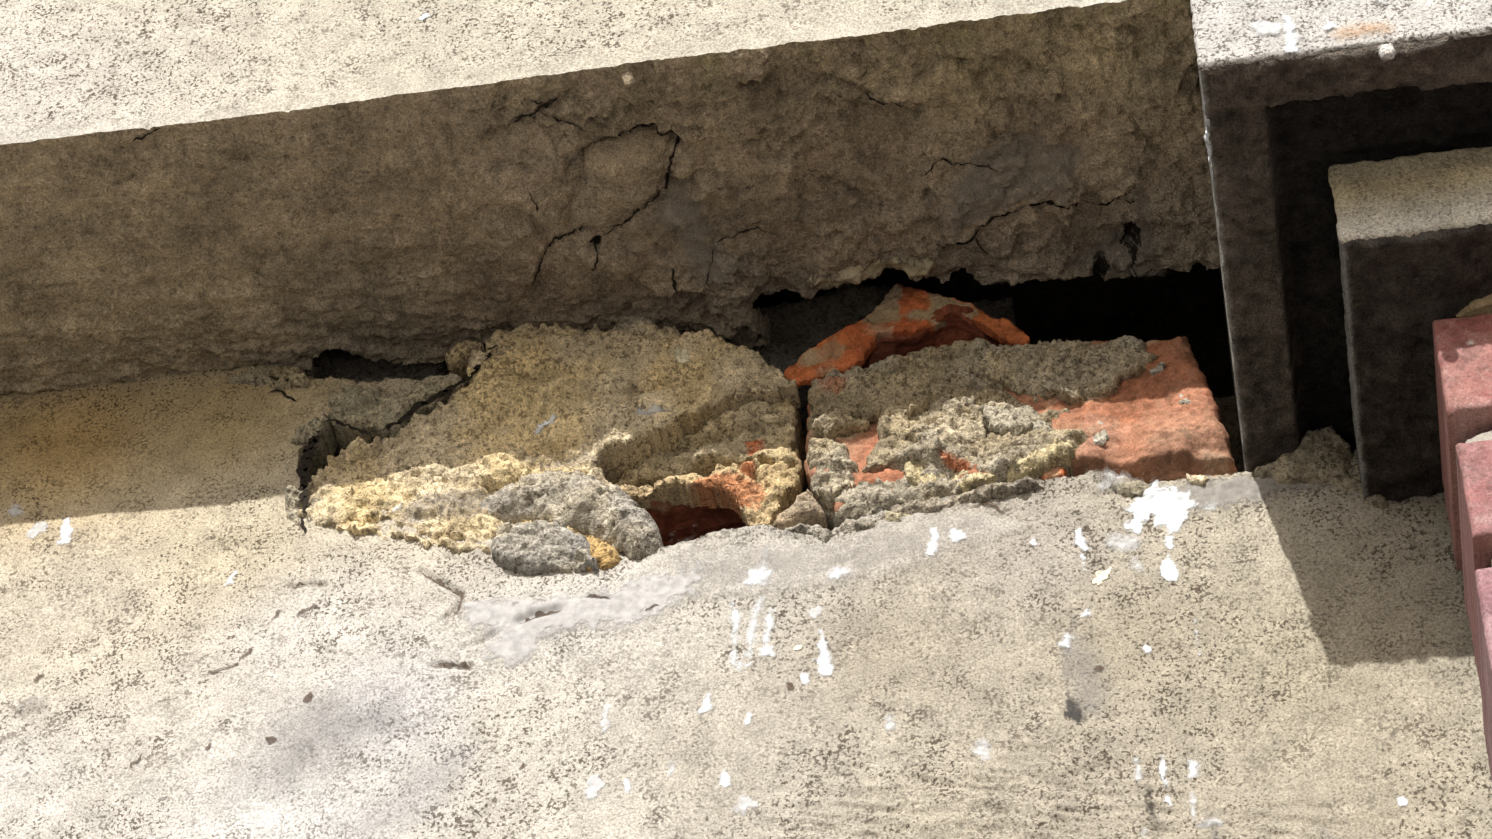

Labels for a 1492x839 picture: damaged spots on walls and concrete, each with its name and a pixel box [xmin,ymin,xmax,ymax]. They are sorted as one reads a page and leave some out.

crack [508,95,680,283]
flaking render [228,349,464,467]
flaking render [751,255,1245,531]
flaking render [285,485,303,522]
damp [731,554,774,666]
damp [794,607,833,683]
damp [830,567,848,578]
damp [927,528,966,555]
damp [1075,481,1214,585]
damp [973,740,989,758]
damp [1159,760,1172,806]
damp [1188,760,1221,826]